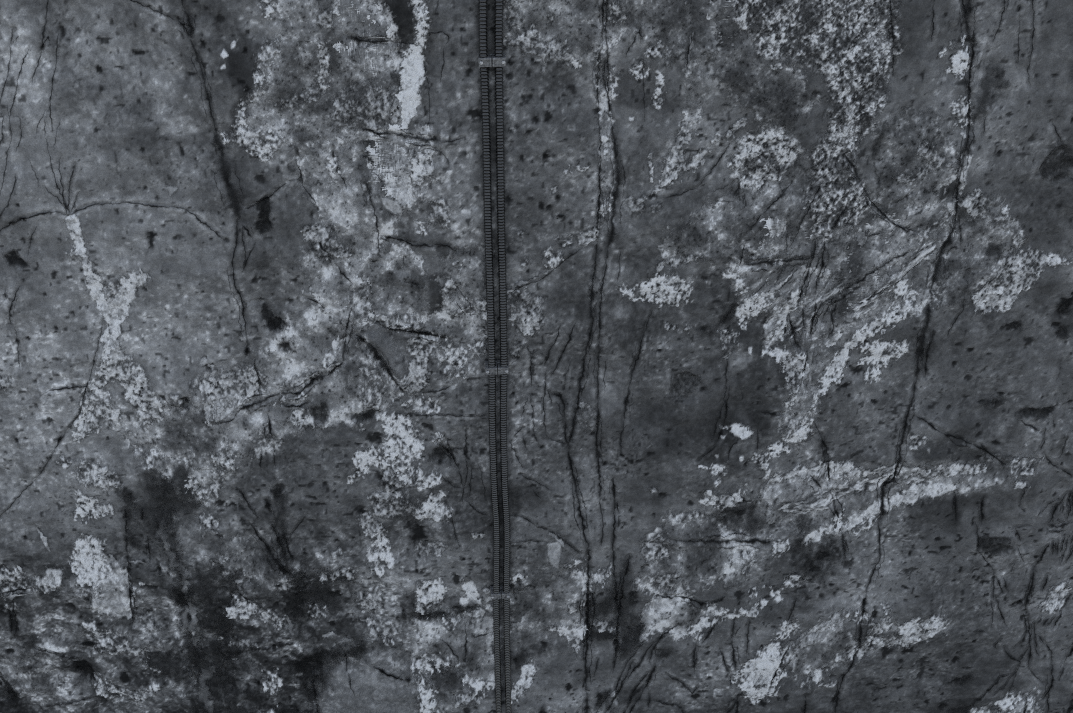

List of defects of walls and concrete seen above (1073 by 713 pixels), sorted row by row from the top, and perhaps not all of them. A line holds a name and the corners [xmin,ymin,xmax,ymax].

water stain [388,0,430,133]
water stain [624,55,801,217]
water stain [732,0,904,152]
water stain [0,211,454,713]
crack [0,0,750,713]
water stain [401,577,490,622]
crack [676,533,770,550]
crack [701,361,777,459]
water stain [731,603,950,705]
water stain [619,188,1073,579]
crack [739,0,1035,711]
crack [952,420,1073,713]